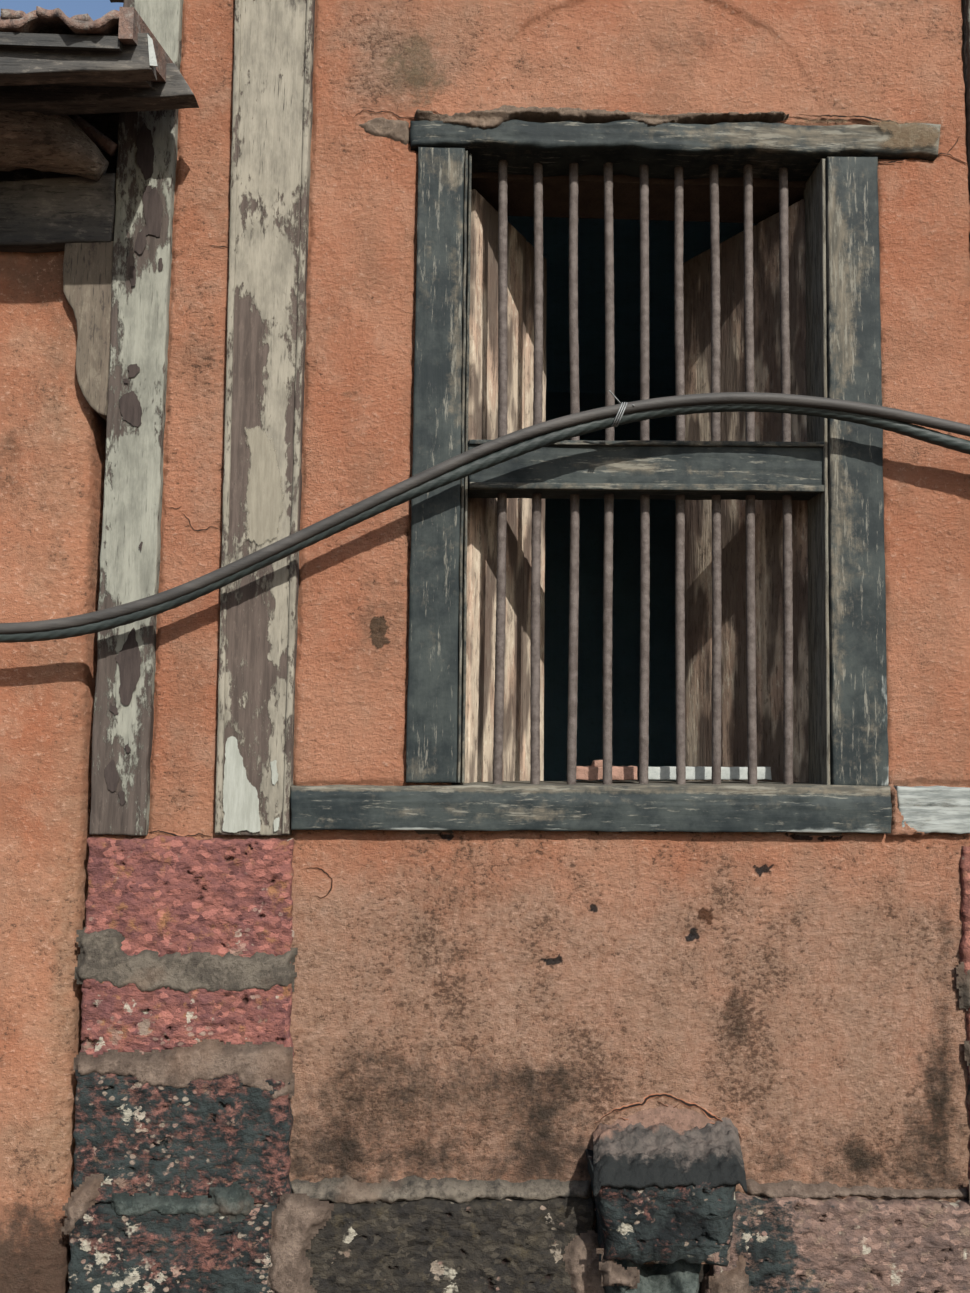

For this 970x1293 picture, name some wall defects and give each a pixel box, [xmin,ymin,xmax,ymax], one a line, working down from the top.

peeling [119,364,142,427]
peeling [245,426,283,546]
peeling [110,628,141,715]
peeling [104,743,131,805]
peeling [222,736,280,833]